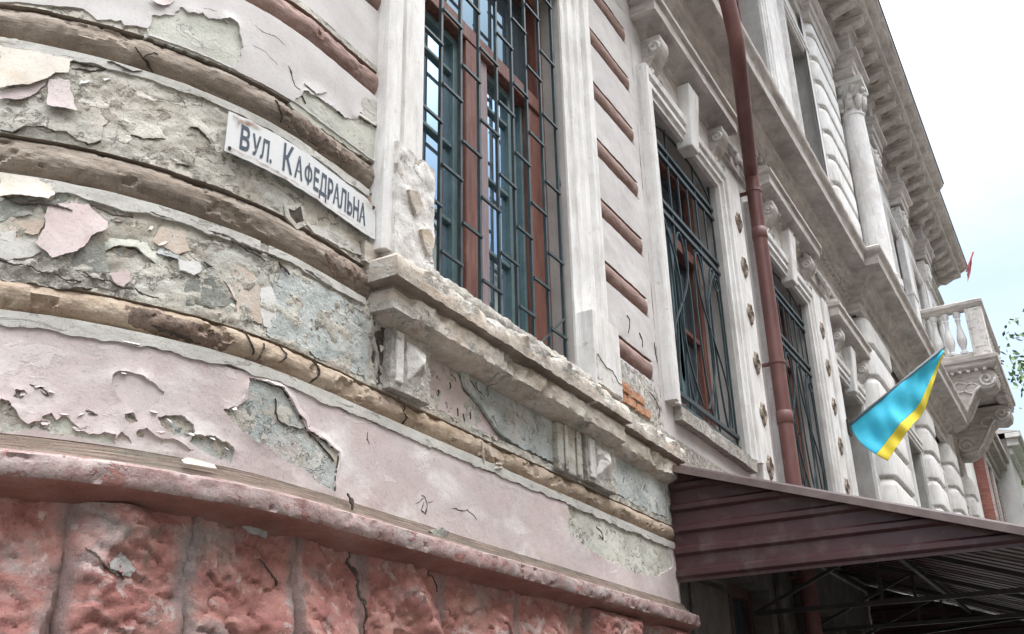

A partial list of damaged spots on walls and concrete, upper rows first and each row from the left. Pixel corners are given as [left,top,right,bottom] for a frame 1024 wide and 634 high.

peeling [0,37,90,111]
spalling [0,172,236,352]
spalling [283,202,308,229]
spalling [406,190,423,216]
spalling [419,228,435,255]
flaking render [266,246,385,385]
peeling [41,371,233,463]
peeling [228,379,335,490]
crack [241,330,344,491]
spalling [596,354,662,427]
crack [85,547,124,580]
peeling [568,506,672,576]